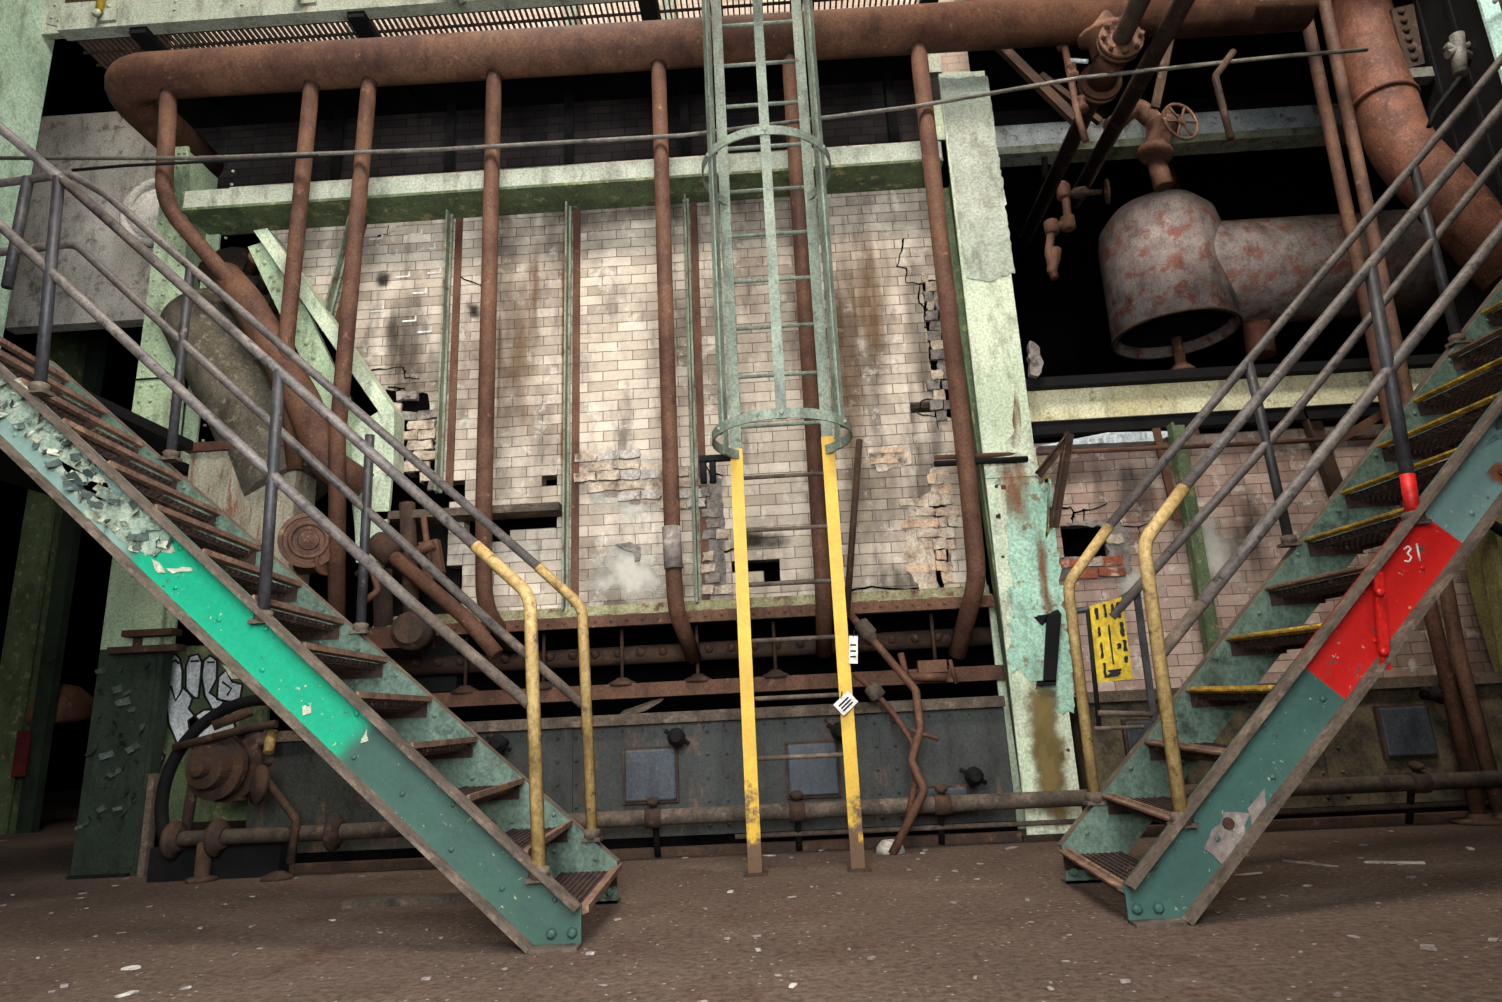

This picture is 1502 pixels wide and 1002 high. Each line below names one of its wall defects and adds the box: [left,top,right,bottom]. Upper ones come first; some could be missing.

peeling [448,447,1133,722]
peeling [74,652,158,870]
spalling [276,703,312,731]
rust [1028,686,1066,818]